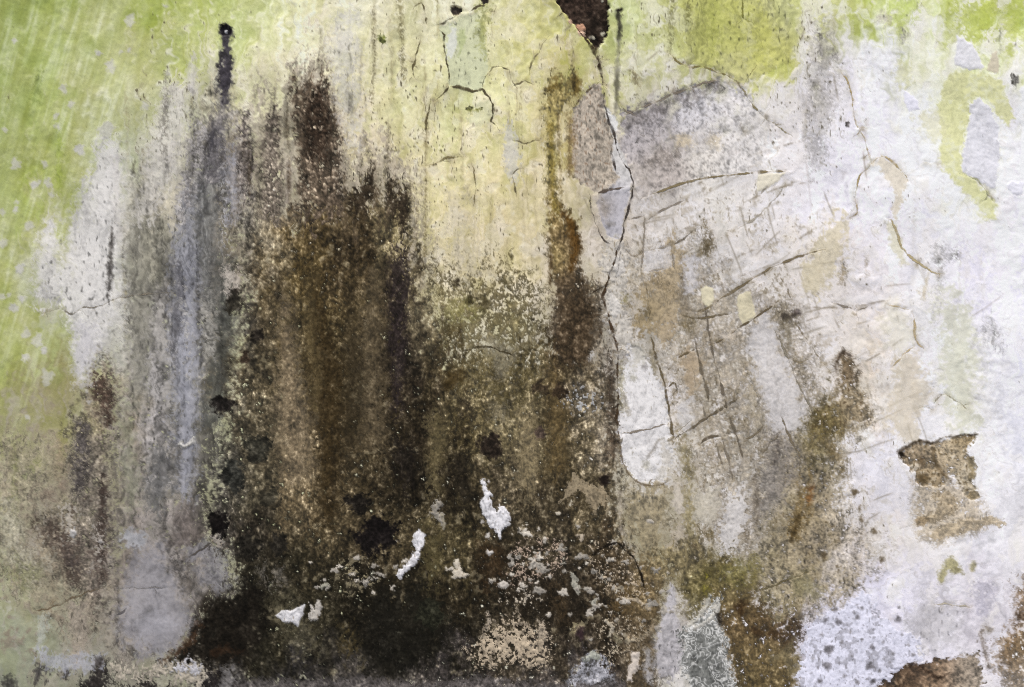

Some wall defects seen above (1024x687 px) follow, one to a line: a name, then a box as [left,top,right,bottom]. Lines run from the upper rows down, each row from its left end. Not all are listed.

leakage [367,0,387,120]
crack [412,3,537,130]
leakage [465,105,484,115]
crack [844,76,907,177]
crack [563,10,787,486]
peeling [555,0,804,558]
crack [890,219,939,274]
peeling [736,290,878,450]
spalling [896,432,1007,542]
leakage [0,672,19,687]
leakage [202,662,222,687]
leakage [625,620,658,683]